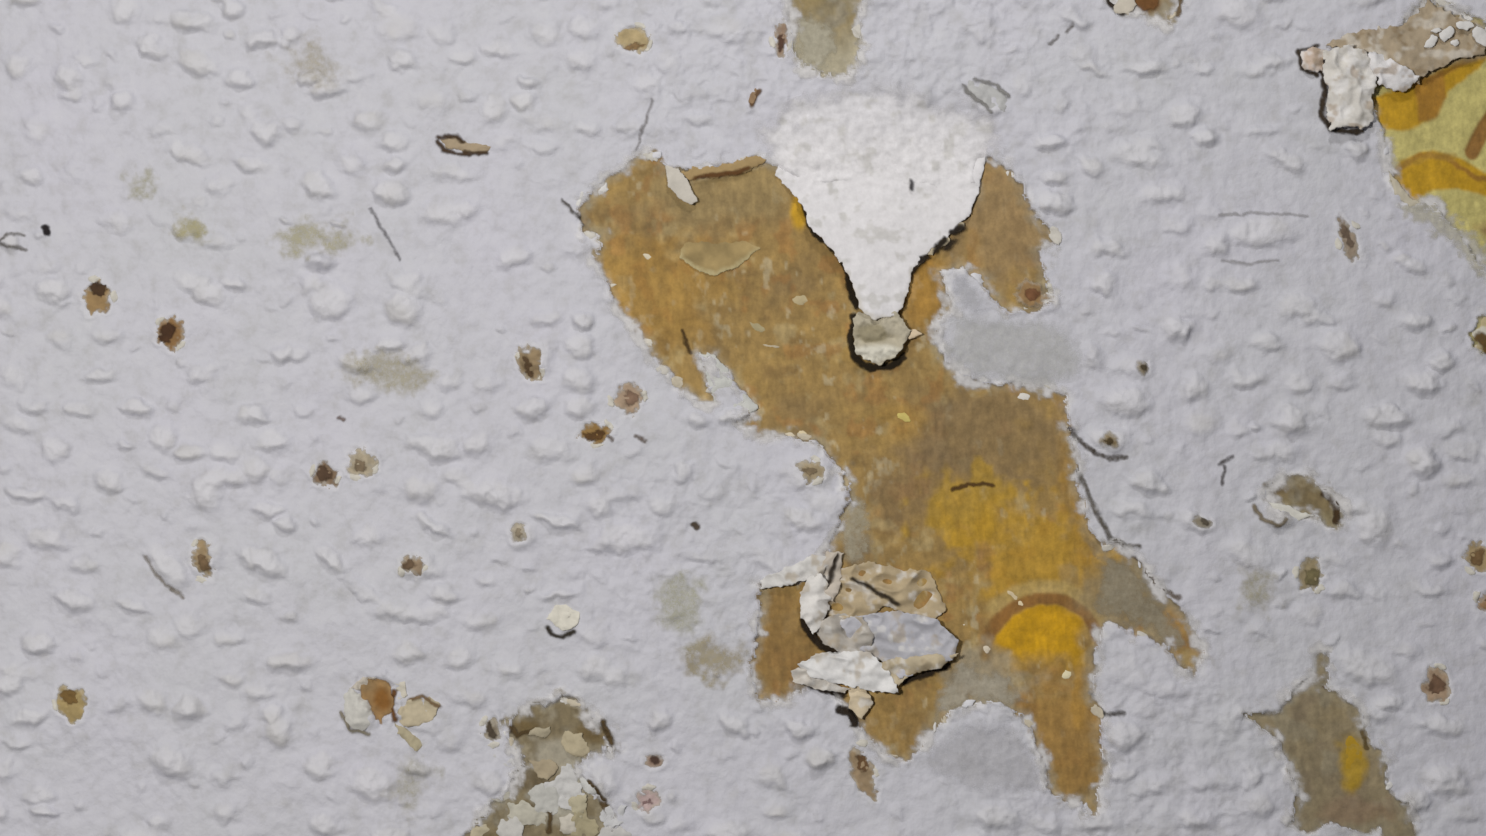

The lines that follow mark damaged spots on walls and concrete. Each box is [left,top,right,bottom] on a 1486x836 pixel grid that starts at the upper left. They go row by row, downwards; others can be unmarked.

peeling [1296,0,1486,279]
peeling [1469,316,1486,354]
peeling [576,0,1212,819]
peeling [1253,470,1352,530]
spalling [339,677,440,752]
peeling [465,692,663,836]
peeling [1243,642,1420,836]